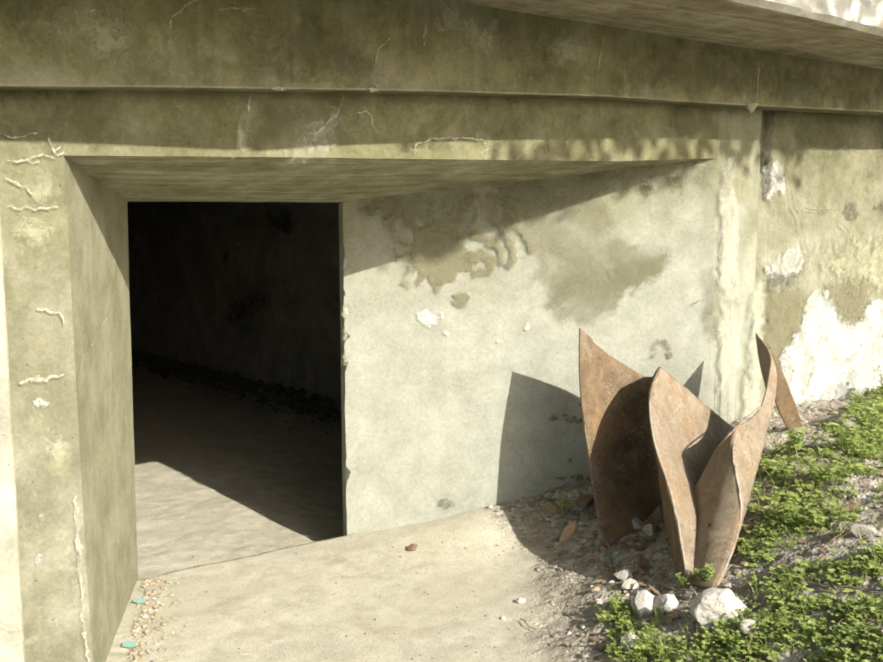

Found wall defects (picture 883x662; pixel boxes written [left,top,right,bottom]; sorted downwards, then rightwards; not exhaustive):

crack [312,105,380,140]
crack [415,100,486,156]
crack [5,133,63,210]
peeling [762,162,786,201]
crack [19,313,111,400]
spalling [417,310,444,327]
damp [366,192,535,293]
damp [452,292,470,308]
peeling [742,246,808,418]
peeling [778,289,883,404]
peeling [828,241,883,288]
crack [73,496,90,662]